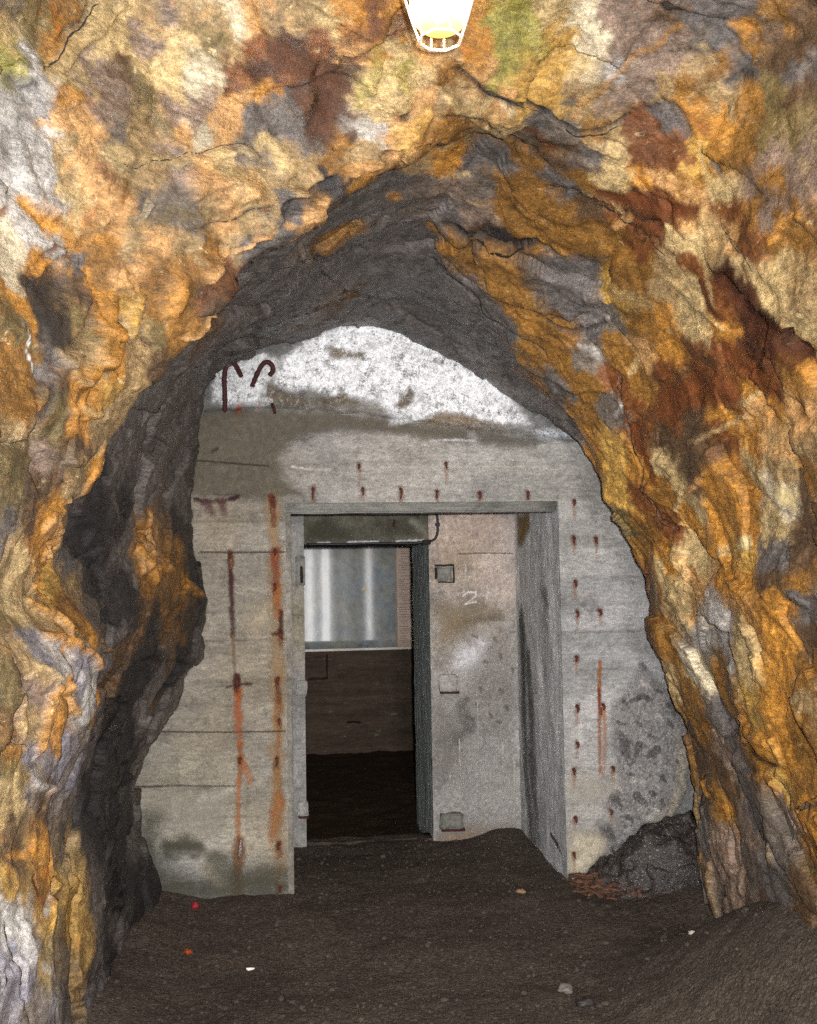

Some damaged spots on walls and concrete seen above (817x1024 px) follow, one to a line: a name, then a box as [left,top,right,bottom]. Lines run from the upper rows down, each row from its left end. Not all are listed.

corrosion [194,495,239,510]
corrosion [268,494,283,642]
leakage [141,787,286,899]
corrosion [233,742,246,876]
corrosion [231,674,252,729]
corrosion [271,656,282,855]
corrosion [598,660,606,755]